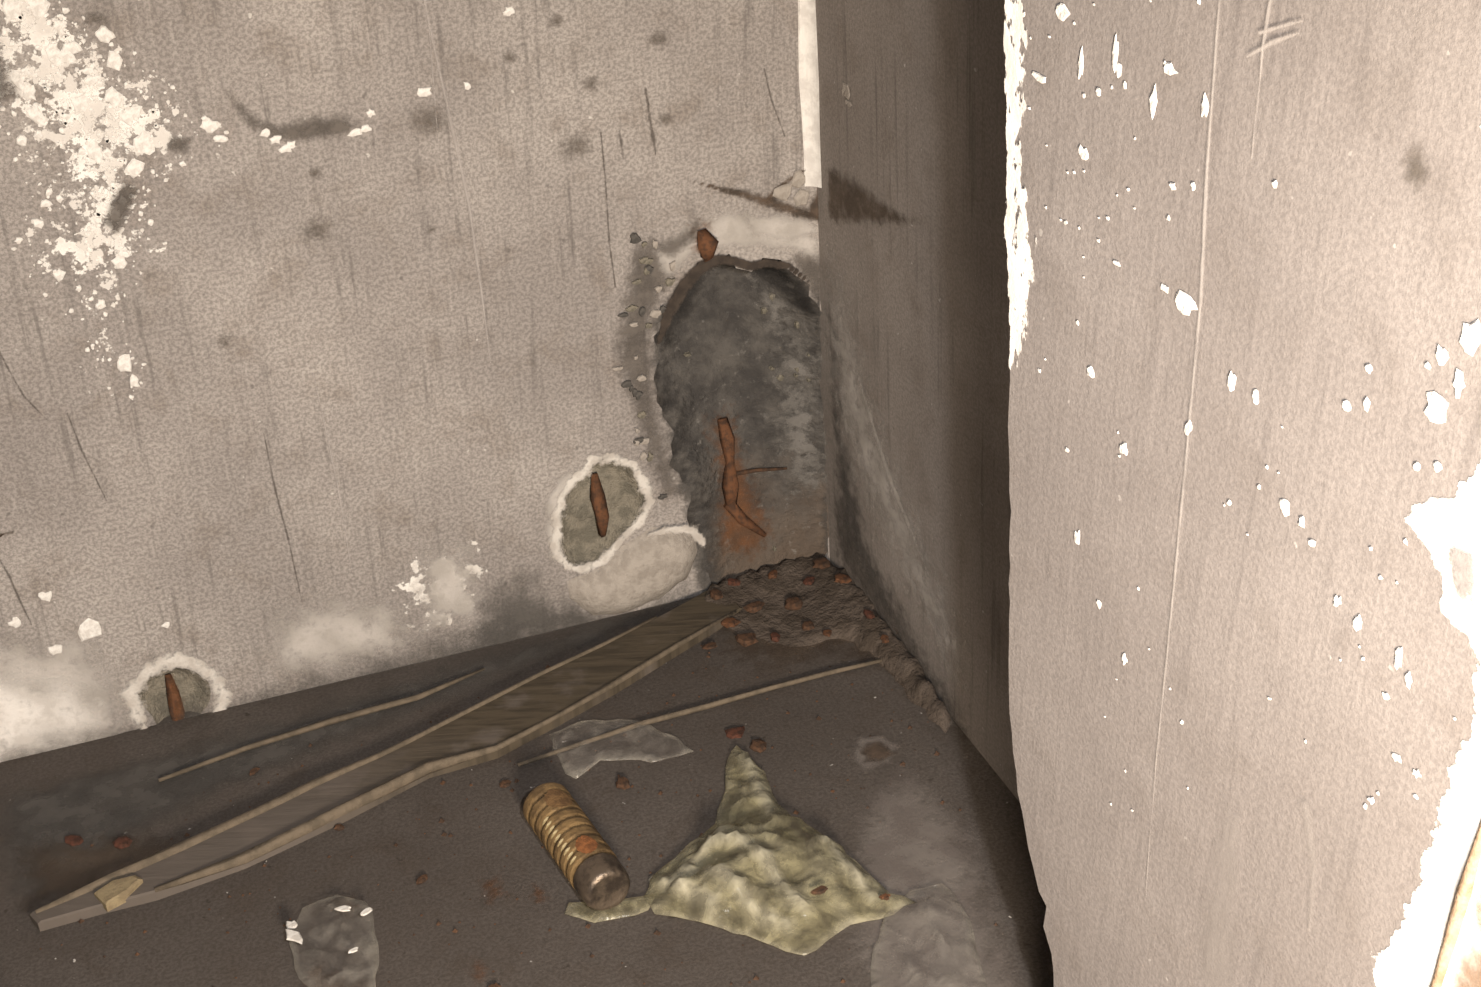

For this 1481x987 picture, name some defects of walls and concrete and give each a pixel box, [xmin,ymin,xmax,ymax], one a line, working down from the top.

peeling [1055,3,1075,25]
peeling [1078,35,1127,98]
peeling [1149,61,1178,120]
crack [701,170,904,223]
peeling [1003,0,1051,370]
peeling [1161,284,1198,316]
spalling [545,214,829,592]
peeling [1423,319,1481,424]
efflorescence [38,591,52,602]
efflorescence [0,617,126,762]
spalling [117,651,233,730]
peeling [1371,460,1481,987]